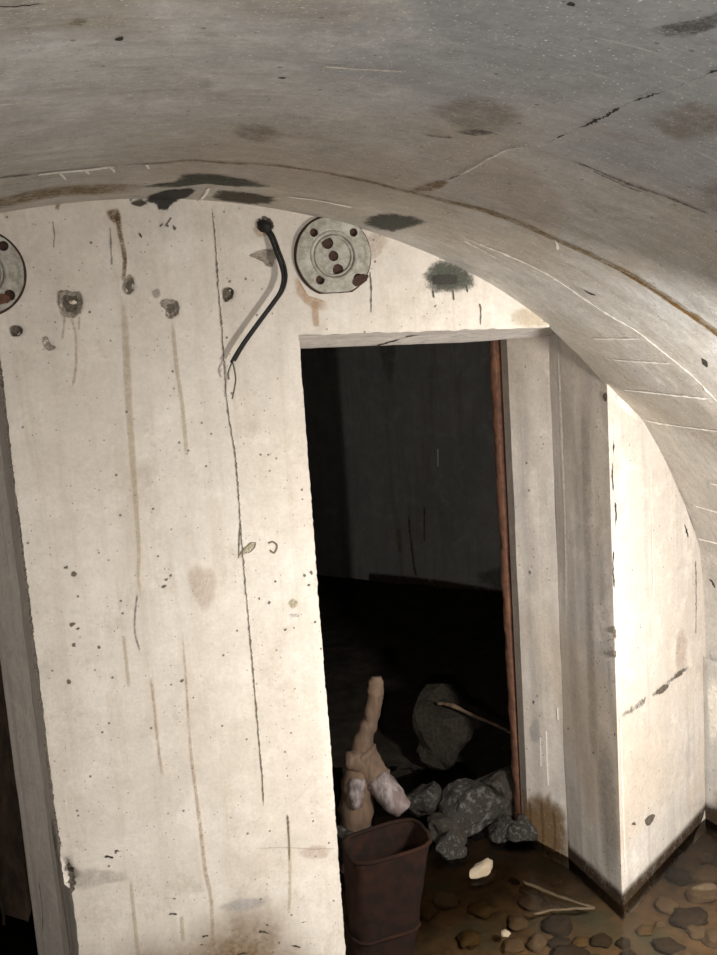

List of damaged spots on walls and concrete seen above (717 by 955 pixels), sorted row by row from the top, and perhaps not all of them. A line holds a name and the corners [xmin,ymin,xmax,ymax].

crack [552,70,717,141]
corrosion [0,234,27,314]
corrosion [108,210,127,276]
damp [131,174,275,210]
corrosion [294,217,371,324]
damp [365,214,423,232]
crack [416,147,523,191]
corrosion [449,202,717,336]
crack [212,212,264,805]
crack [284,815,292,859]
damp [568,805,717,920]
damp [202,929,274,955]